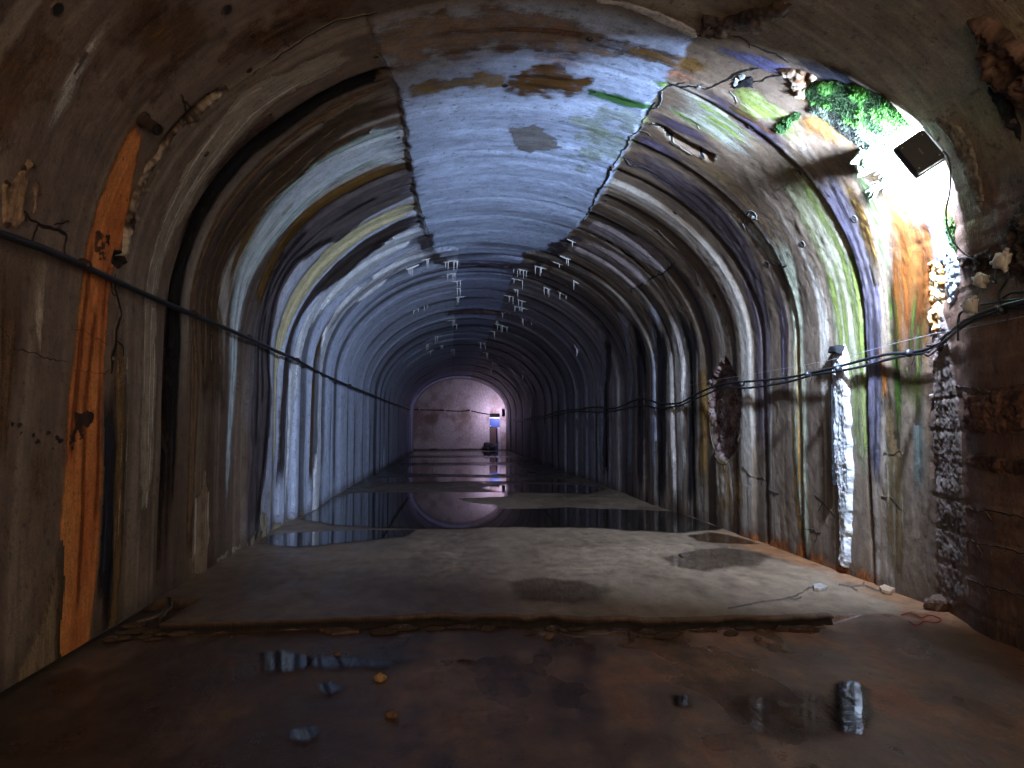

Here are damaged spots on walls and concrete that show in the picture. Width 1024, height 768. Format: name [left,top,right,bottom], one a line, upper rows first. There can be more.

crack [24,210,70,255]
corrosion [60,128,141,657]
spalling [99,85,229,269]
crack [228,7,432,243]
water stain [98,47,671,628]
water stain [368,0,704,99]
crack [577,36,789,292]
spalling [708,356,741,461]
water stain [803,173,923,577]
corrosion [890,194,933,362]
spalling [927,195,1024,607]
spalling [967,17,1024,142]